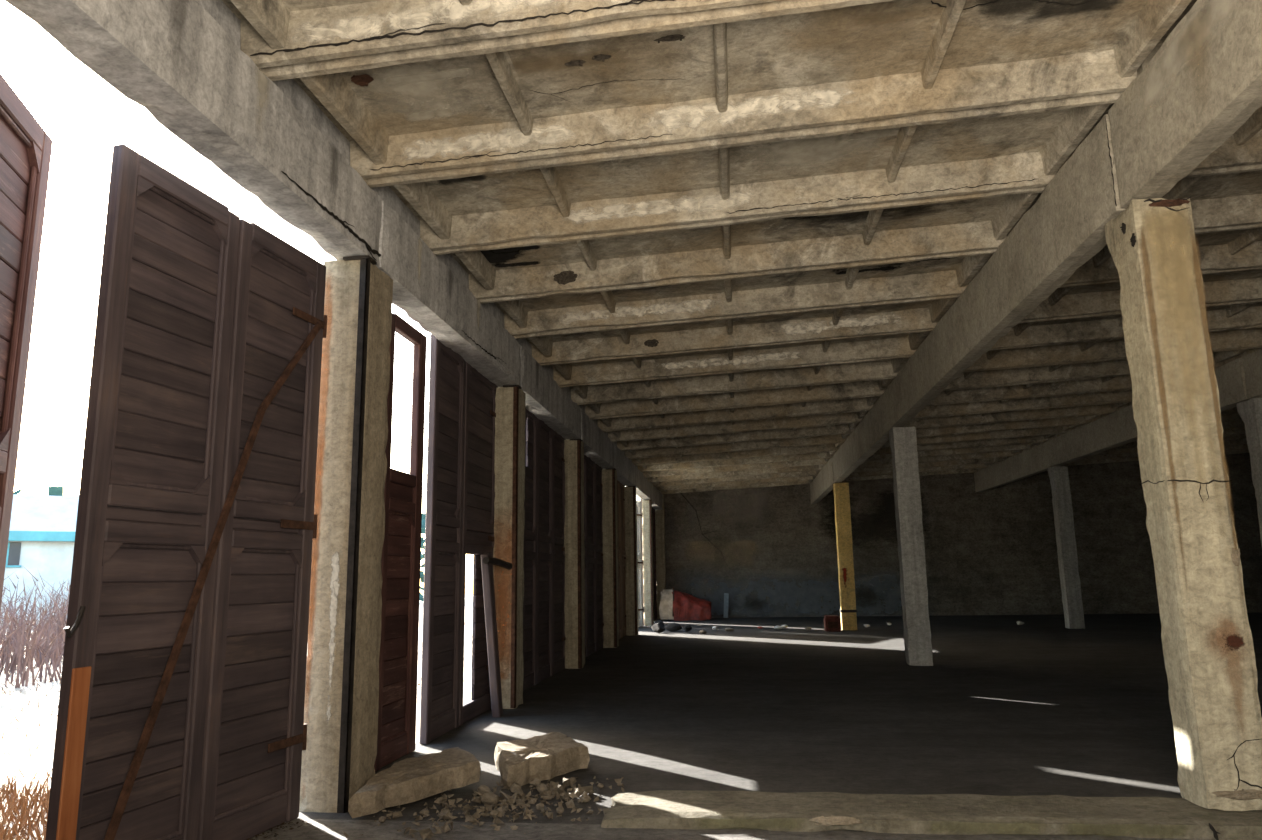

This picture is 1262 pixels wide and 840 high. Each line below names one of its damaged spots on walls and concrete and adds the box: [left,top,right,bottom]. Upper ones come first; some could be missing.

rust [1213,621,1244,651]
crack [1227,739,1262,790]